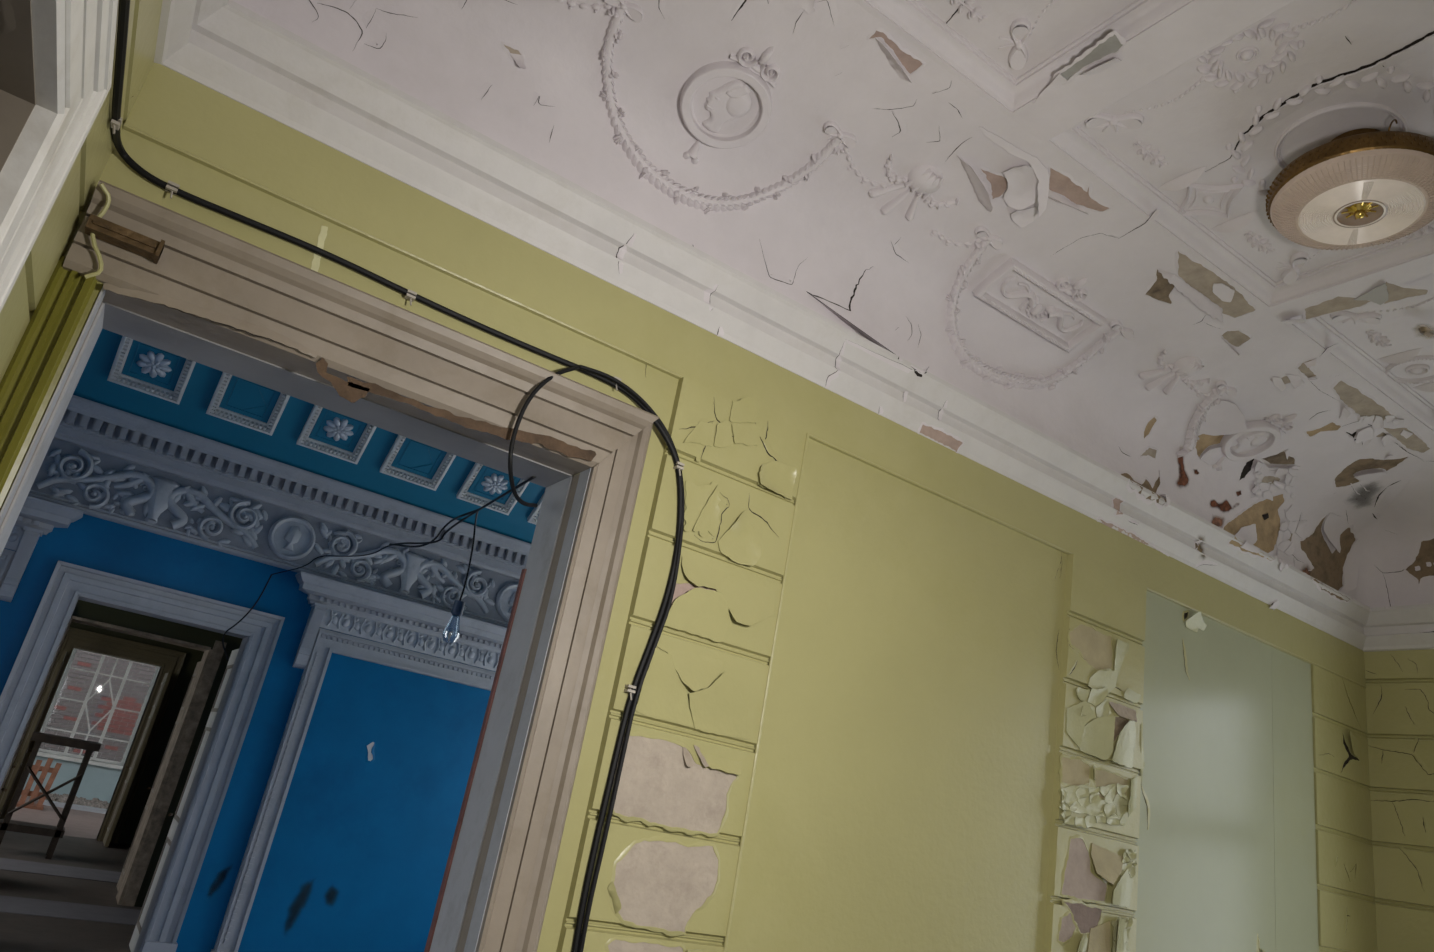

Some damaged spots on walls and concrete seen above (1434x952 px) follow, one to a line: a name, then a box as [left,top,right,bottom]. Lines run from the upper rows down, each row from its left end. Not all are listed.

crack [946,0,976,27]
crack [872,80,974,162]
crack [1206,31,1434,173]
peeling [957,126,1113,227]
peeling [1143,249,1257,355]
crack [678,397,794,467]
peeling [1270,358,1433,488]
crack [694,492,780,543]
peeling [1221,449,1301,563]
peeling [605,480,775,952]
peeling [1057,622,1141,952]
leakage [286,883,337,930]